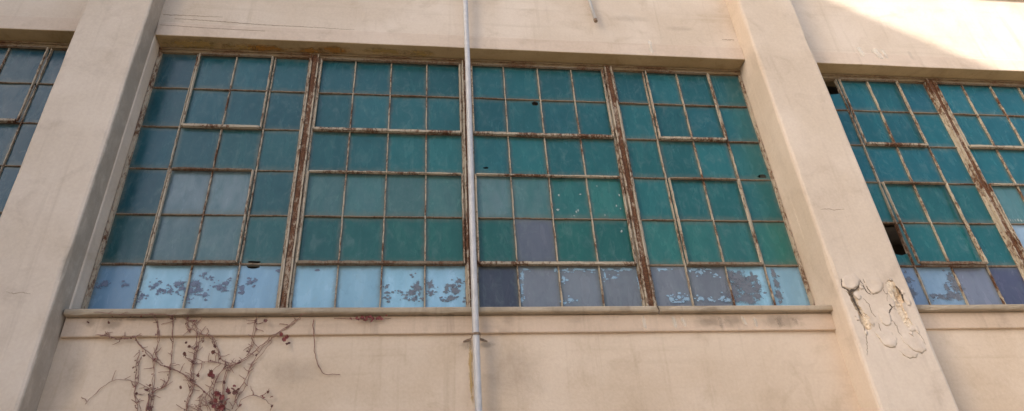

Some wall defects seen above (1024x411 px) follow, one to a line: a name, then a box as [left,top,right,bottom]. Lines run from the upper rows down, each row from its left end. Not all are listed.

rust [165,41,346,53]
spalling [845,282,875,335]
spalling [885,270,920,337]